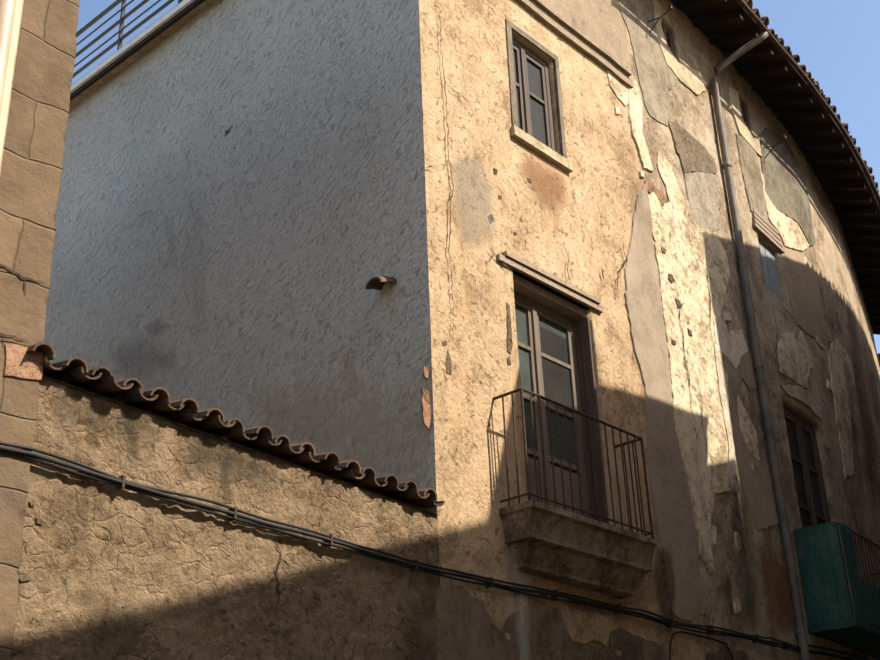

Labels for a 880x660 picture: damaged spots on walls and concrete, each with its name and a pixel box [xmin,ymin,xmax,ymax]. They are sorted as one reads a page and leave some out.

crack [426,0,465,338]
peeling [606,67,762,574]
crack [268,543,290,609]
peeling [475,590,516,641]
peeling [559,605,622,657]